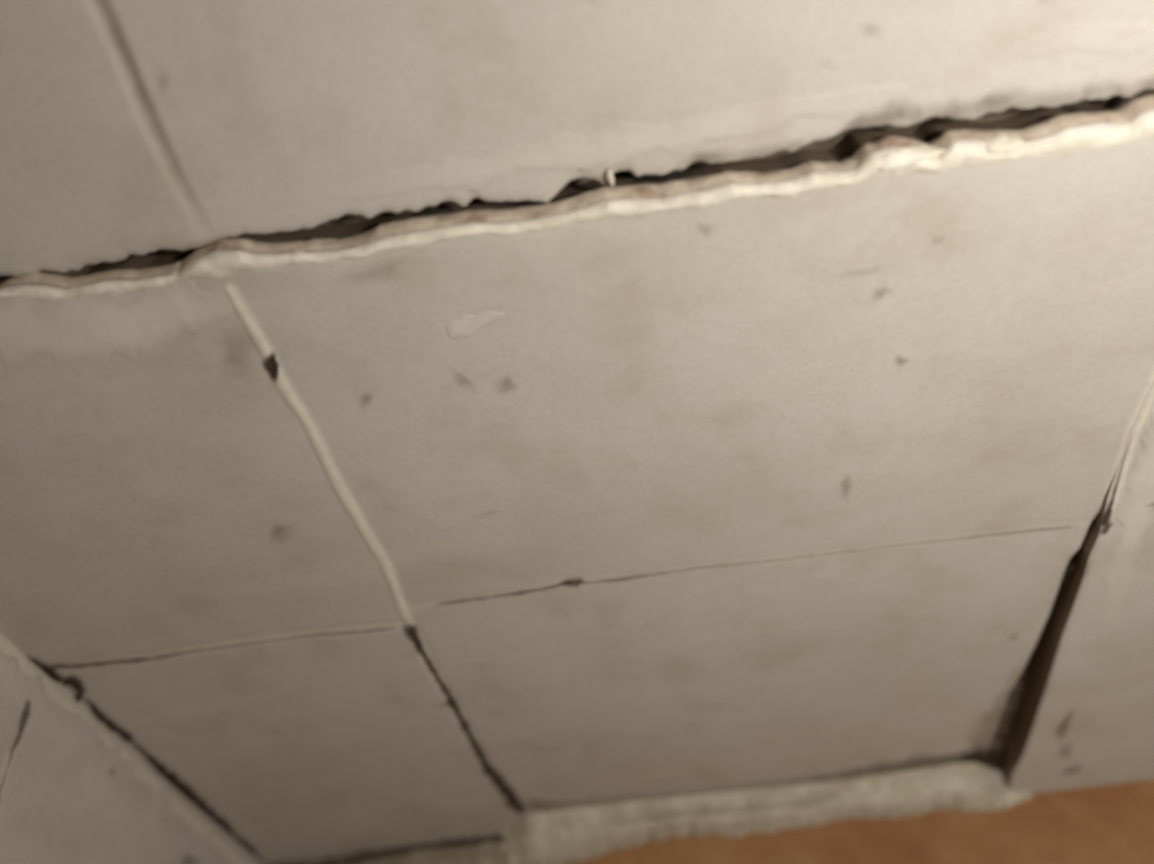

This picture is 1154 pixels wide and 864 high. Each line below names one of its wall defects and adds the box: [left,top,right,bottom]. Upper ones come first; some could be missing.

crack [0,93,1154,301]
crack [1102,488,1117,534]
crack [24,655,264,864]
crack [919,655,1031,771]